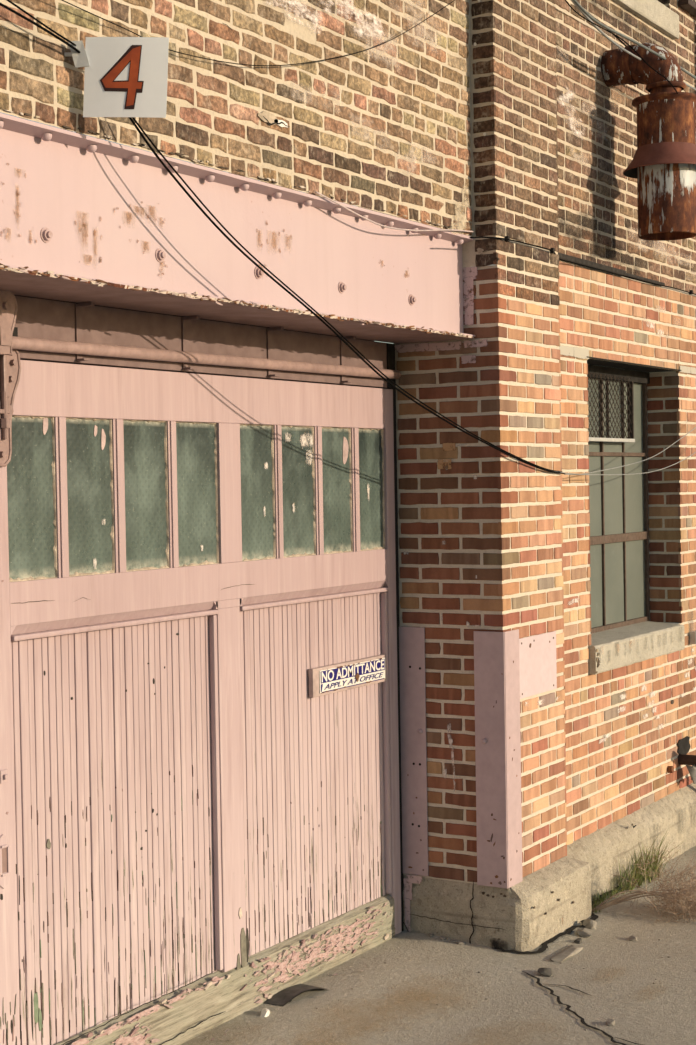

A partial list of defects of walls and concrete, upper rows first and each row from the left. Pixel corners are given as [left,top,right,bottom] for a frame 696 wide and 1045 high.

leakage [269,0,392,48]
spalling [257,111,290,128]
spalling [159,149,244,172]
peeling [0,263,108,287]
peeling [130,286,468,337]
peeling [0,809,389,1045]
crack [404,880,642,1045]